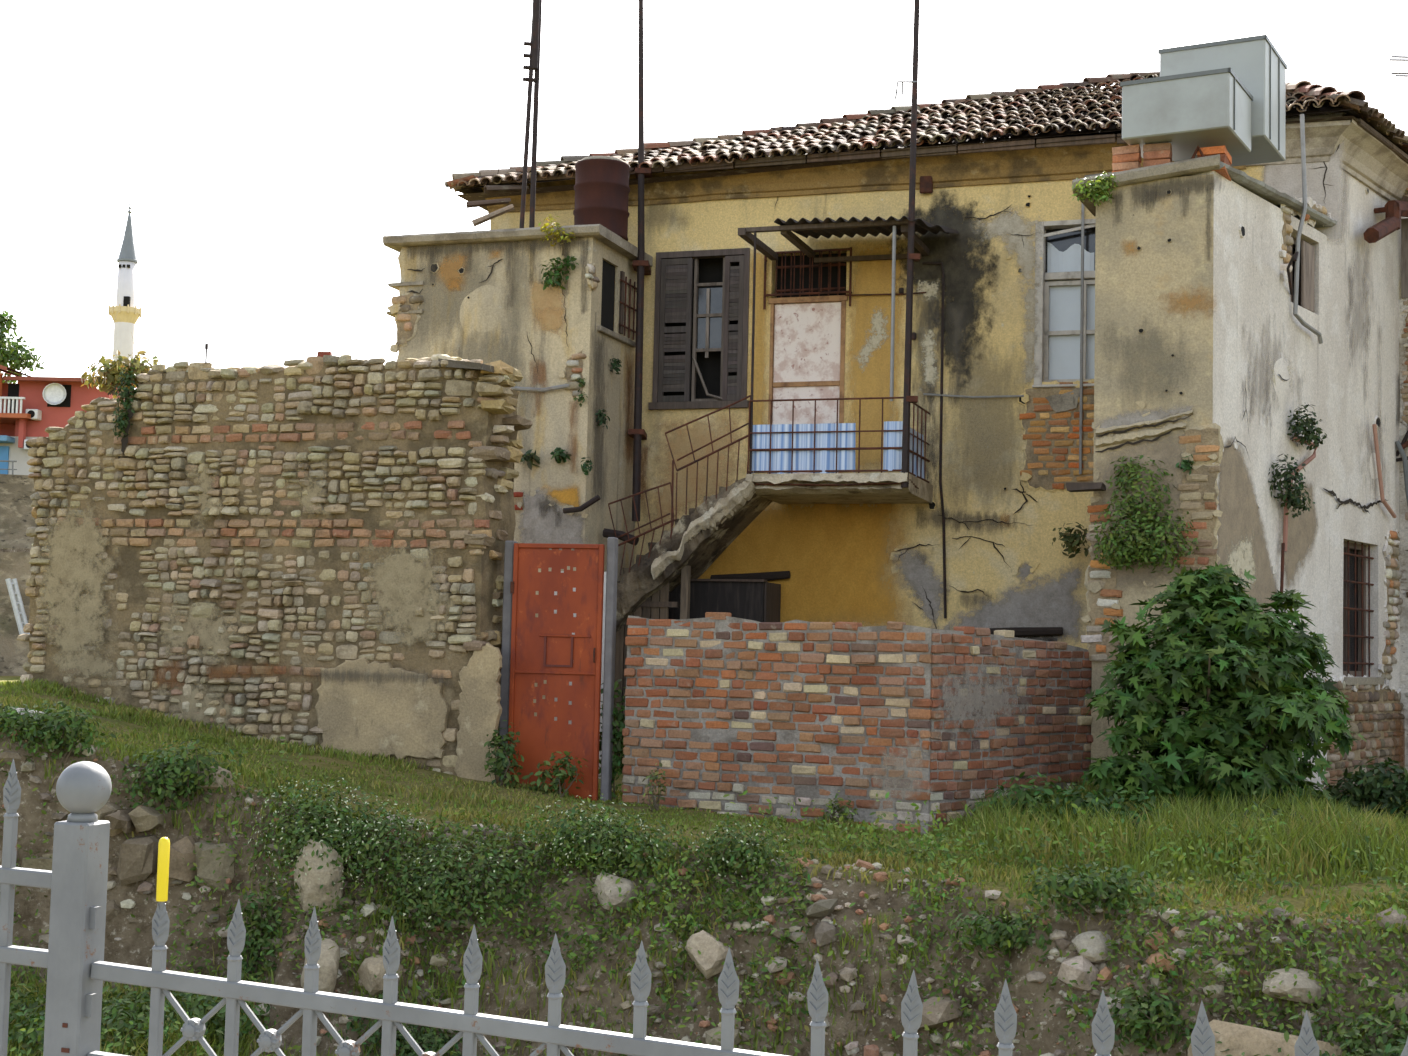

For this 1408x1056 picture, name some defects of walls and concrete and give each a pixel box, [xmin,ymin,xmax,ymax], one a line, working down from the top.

spalling [386,263,440,353]
water stain [891,192,997,470]
spalling [890,195,1238,663]
spalling [1400,298,1408,441]
crack [893,482,1037,568]
crack [1323,488,1388,514]
crack [911,586,987,629]
spalling [1321,512,1408,792]